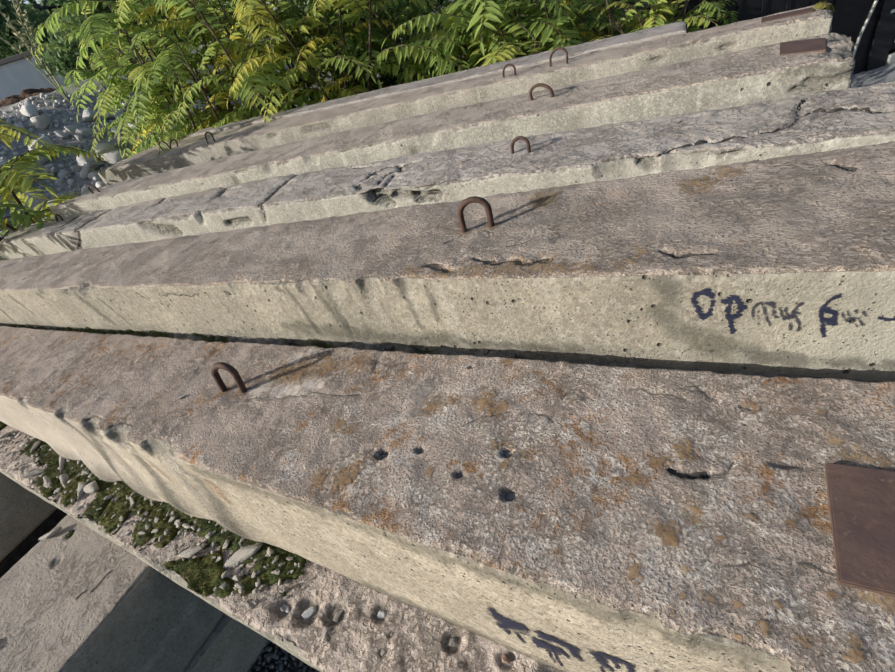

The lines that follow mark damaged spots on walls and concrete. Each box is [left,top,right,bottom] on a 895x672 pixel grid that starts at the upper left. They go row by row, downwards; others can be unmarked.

crack [656,98,893,157]
crack [832,164,857,172]
spalling [368,187,443,207]
spalling [73,417,133,448]